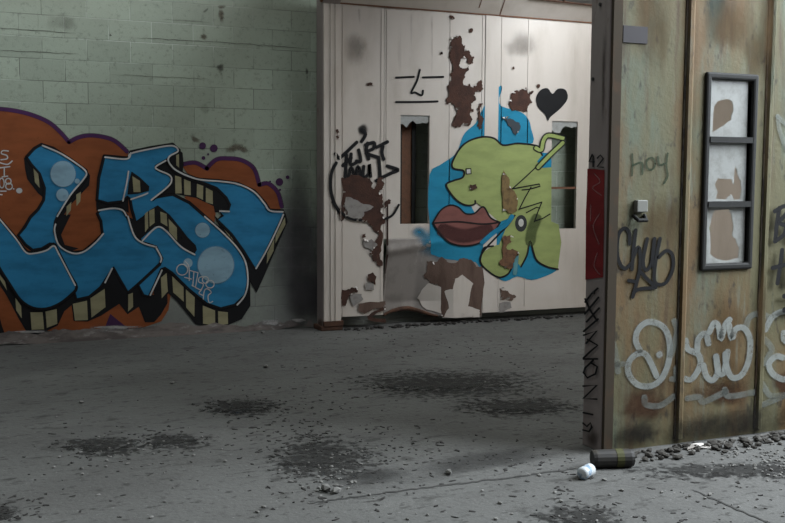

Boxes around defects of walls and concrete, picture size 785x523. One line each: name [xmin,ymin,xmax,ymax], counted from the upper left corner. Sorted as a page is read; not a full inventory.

peeling [440,36,484,129]
peeling [502,84,540,135]
peeling [339,175,391,323]
peeling [418,257,485,318]